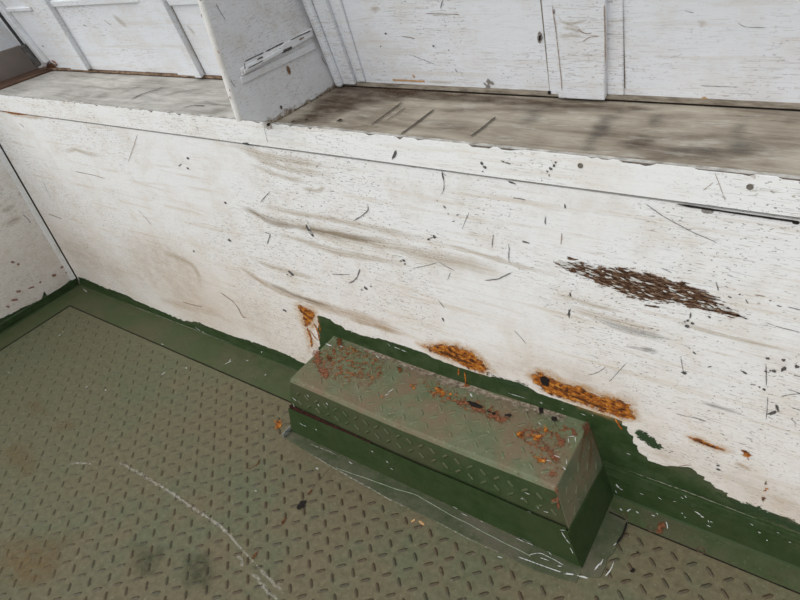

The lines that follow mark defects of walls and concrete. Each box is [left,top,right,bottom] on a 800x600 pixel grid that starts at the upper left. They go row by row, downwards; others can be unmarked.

rust [298,305,590,476]
rust [530,370,636,429]